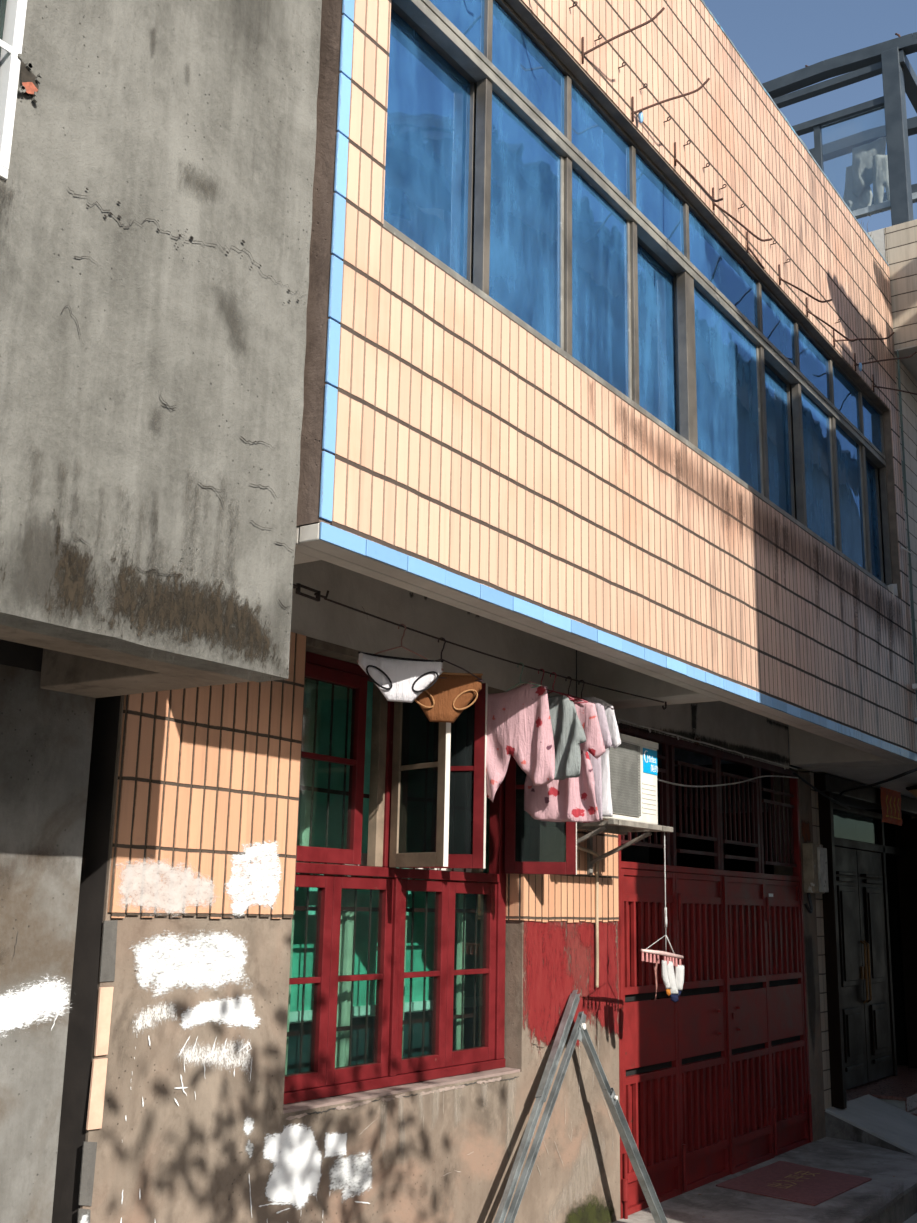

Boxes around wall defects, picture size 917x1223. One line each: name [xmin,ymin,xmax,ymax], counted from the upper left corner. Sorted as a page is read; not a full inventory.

crack [68,187,305,304]
water stain [23,509,288,678]
water stain [624,411,902,674]
peeling [523,920,620,1053]